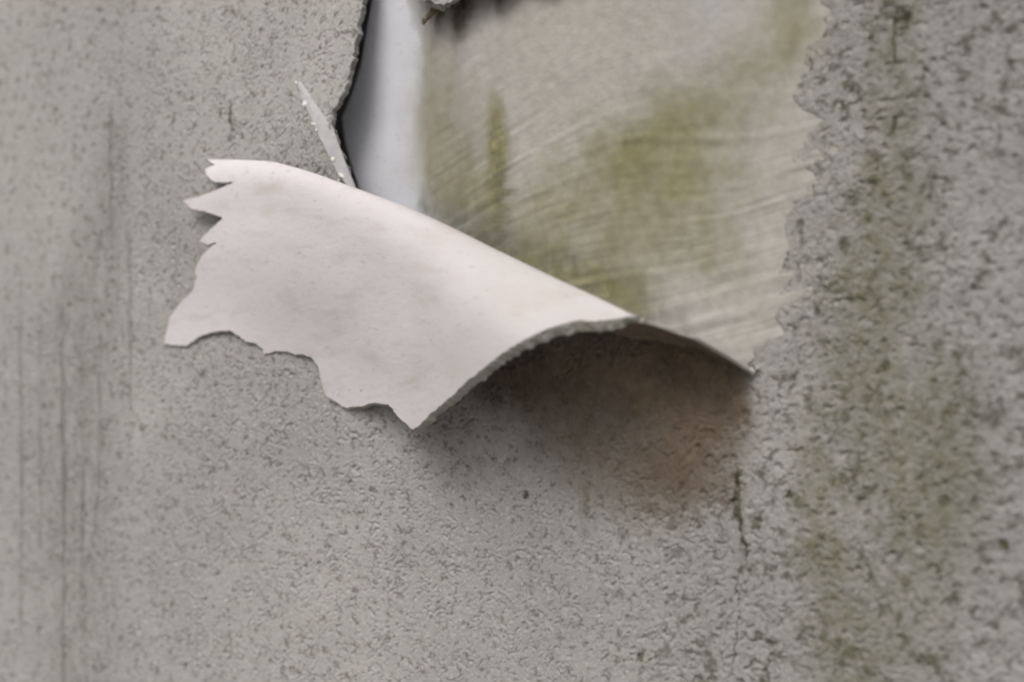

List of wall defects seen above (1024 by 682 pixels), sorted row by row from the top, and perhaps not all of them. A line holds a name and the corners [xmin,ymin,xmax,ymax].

peeling [164,0,760,433]
leakage [422,0,849,487]
crack [725,468,748,669]